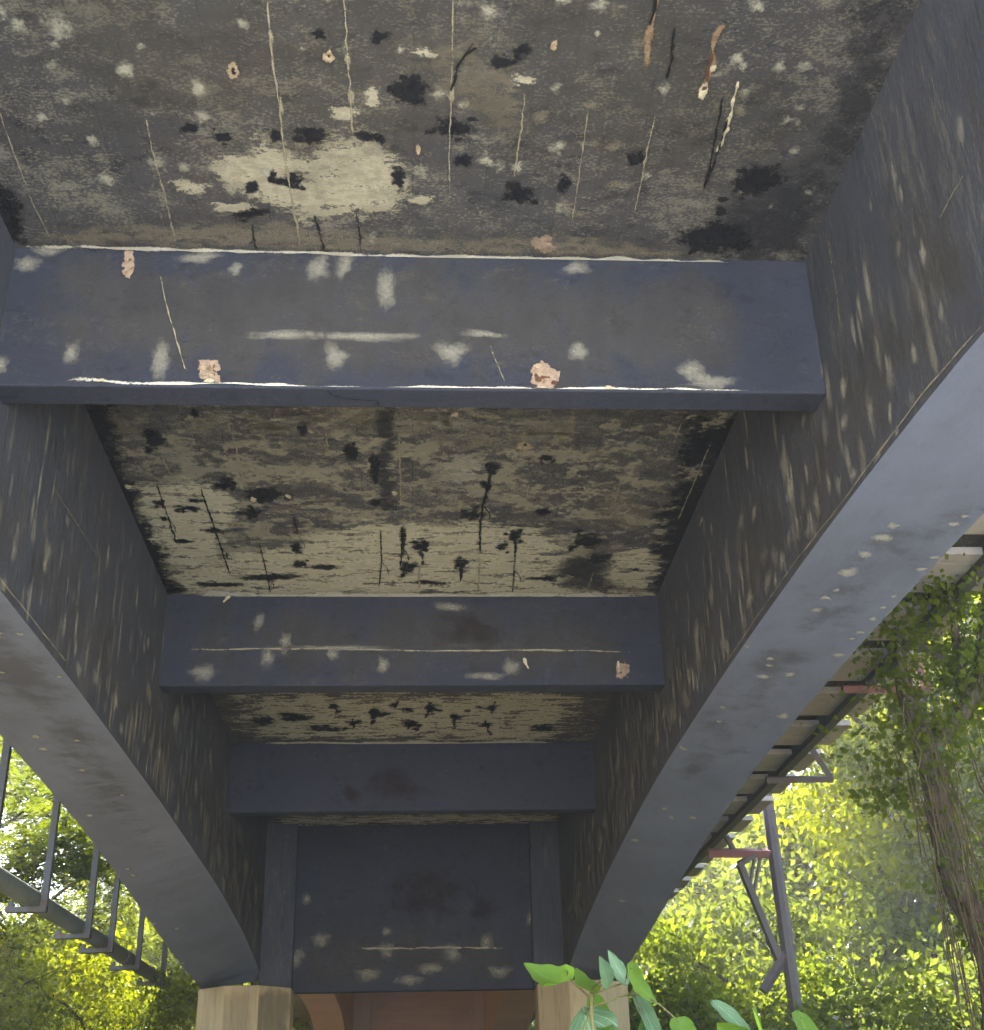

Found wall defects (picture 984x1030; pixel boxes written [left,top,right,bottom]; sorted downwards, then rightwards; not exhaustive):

leakage [0,0,722,276]
crack [704,98,728,189]
leakage [379,275,393,304]
leakage [329,333,414,365]
leakage [571,344,586,358]
spalling [197,360,221,383]
spalling [530,360,560,389]
leakage [560,363,738,391]
leakage [199,517,642,610]
leakage [307,646,367,657]
spalling [615,661,630,679]
leakage [266,701,548,744]